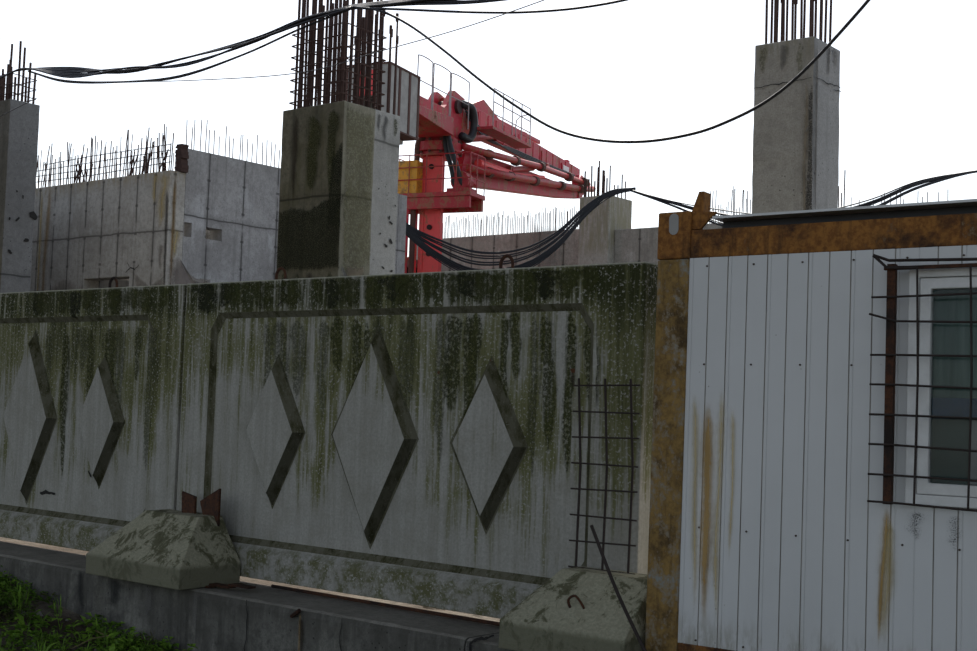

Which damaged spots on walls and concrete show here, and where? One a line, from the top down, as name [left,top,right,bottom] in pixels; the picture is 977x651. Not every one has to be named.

water stain [292,111,339,191]
water stain [33,291,94,318]
water stain [60,335,70,471]
water stain [107,262,600,398]
water stain [443,314,482,417]
water stain [539,314,600,471]
rust [693,416,733,594]
rust [878,516,891,626]